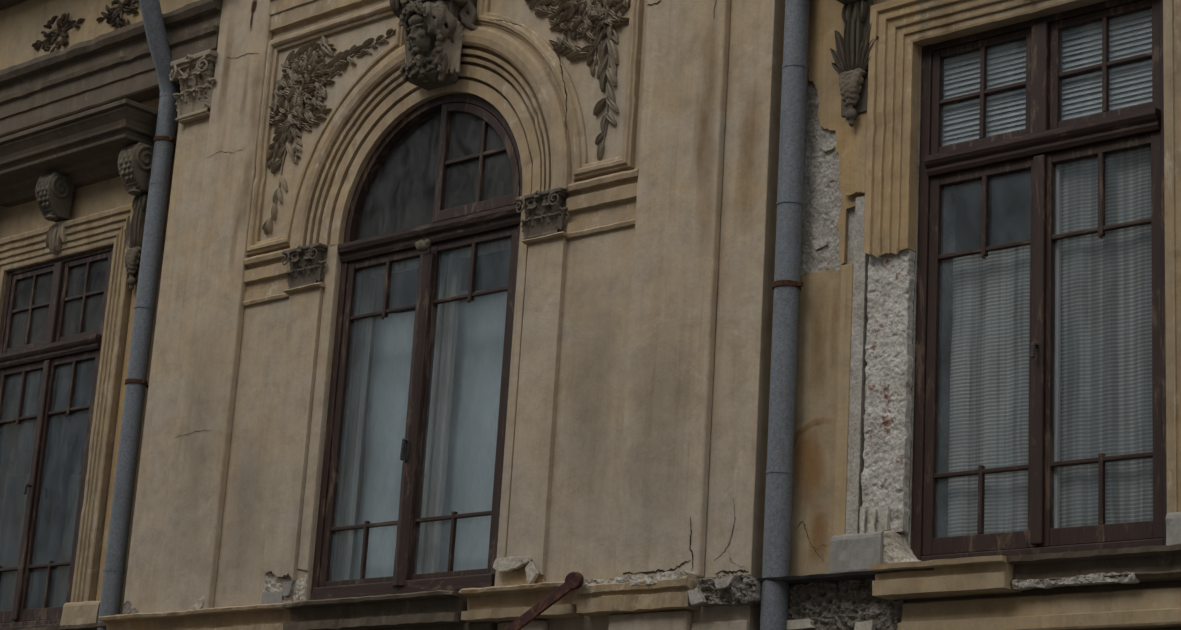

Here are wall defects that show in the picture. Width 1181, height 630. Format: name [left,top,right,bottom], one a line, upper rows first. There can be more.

flaking render [800,79,846,275]
flaking render [859,249,920,564]
crack [623,498,749,575]
flaking render [261,573,307,604]
flaking render [579,570,762,607]
flaking render [786,579,906,630]